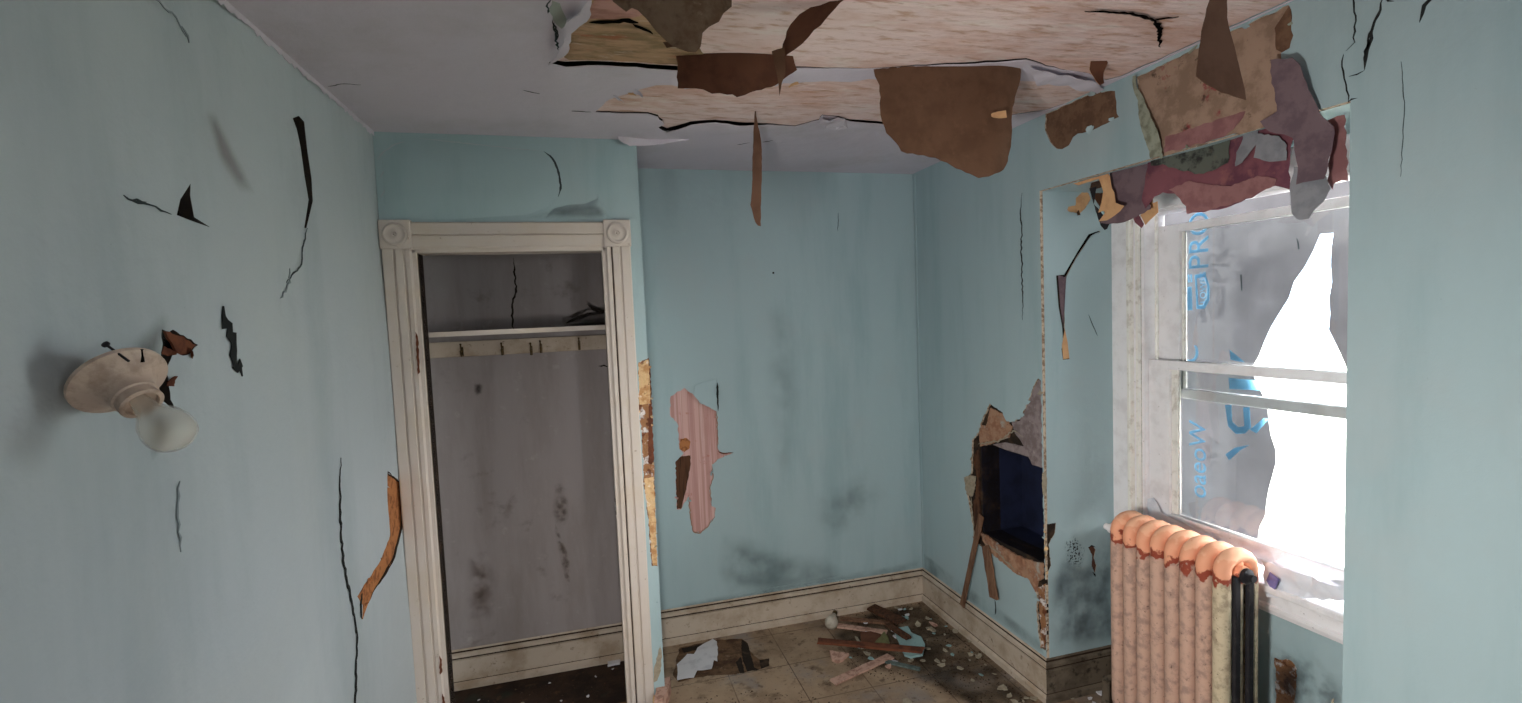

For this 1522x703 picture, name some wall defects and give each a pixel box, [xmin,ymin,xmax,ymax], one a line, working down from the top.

crack [156,0,190,43]
crack [1341,0,1431,177]
crack [123,195,180,216]
peeling [1067,192,1090,215]
crack [281,228,308,298]
crack [510,258,518,329]
crack [222,306,243,377]
flaking render [638,358,733,566]
spalling [964,380,1049,649]